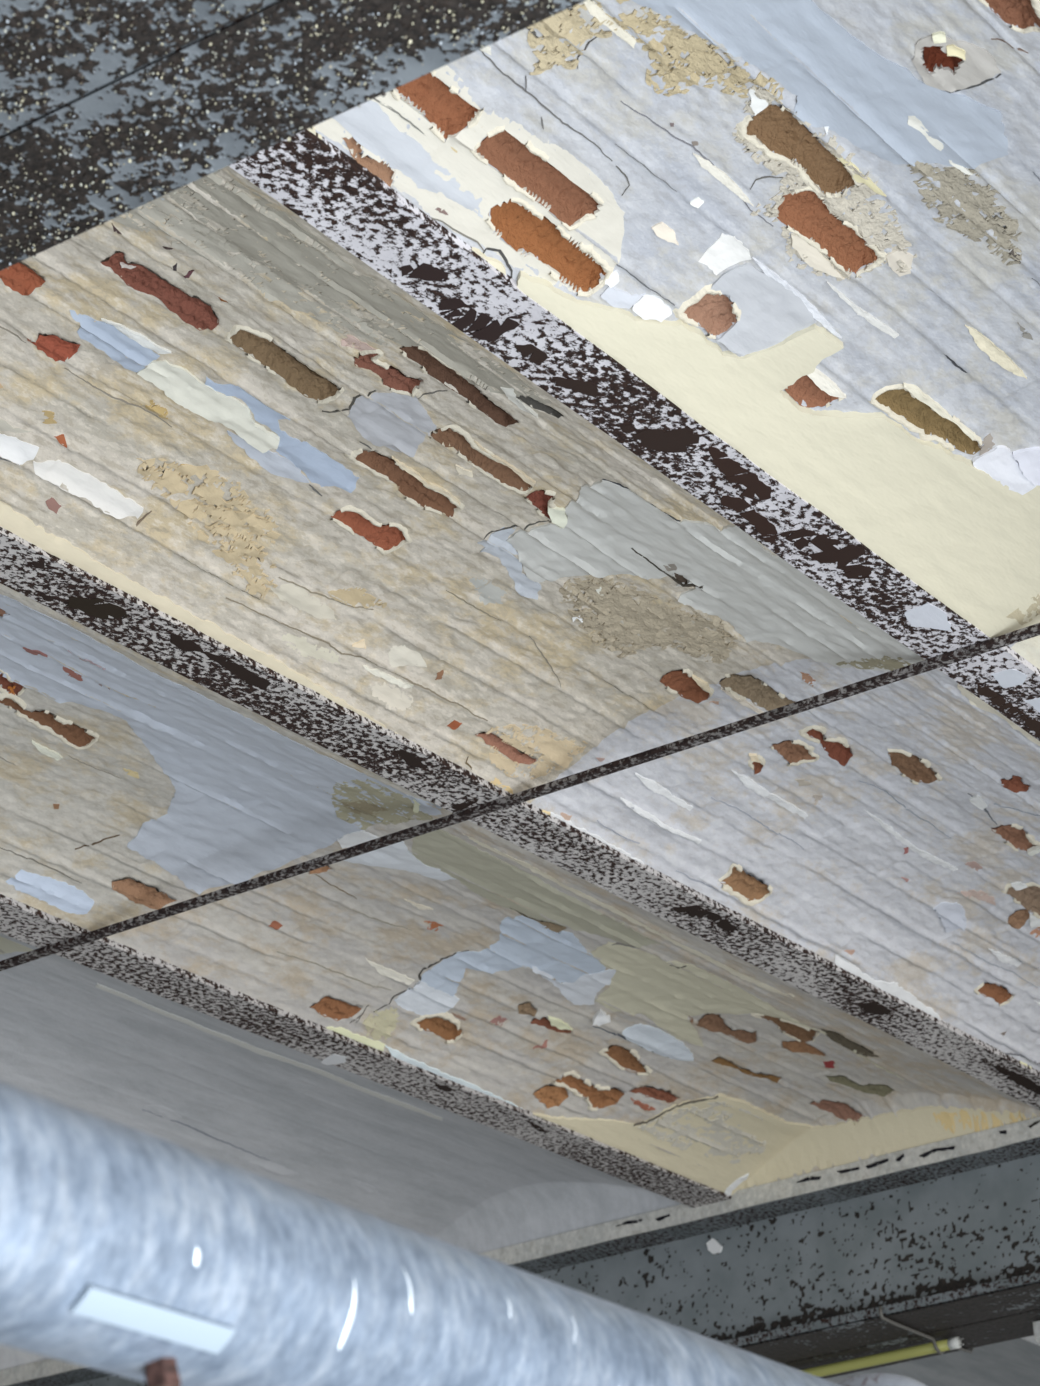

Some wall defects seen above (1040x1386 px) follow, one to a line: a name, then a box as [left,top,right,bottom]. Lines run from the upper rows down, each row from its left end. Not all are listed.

flaking render [978,0,1040,34]
peeling [0,0,1022,355]
peeling [31,310,160,372]
peeling [0,434,144,519]
peeling [101,252,923,775]
peeling [904,603,952,632]
peeling [991,669,1040,713]
flaking render [887,749,943,785]
peeling [0,594,904,1122]
flaking render [1001,881,1040,929]
peeling [835,954,941,1020]
flaking render [974,982,1015,1007]